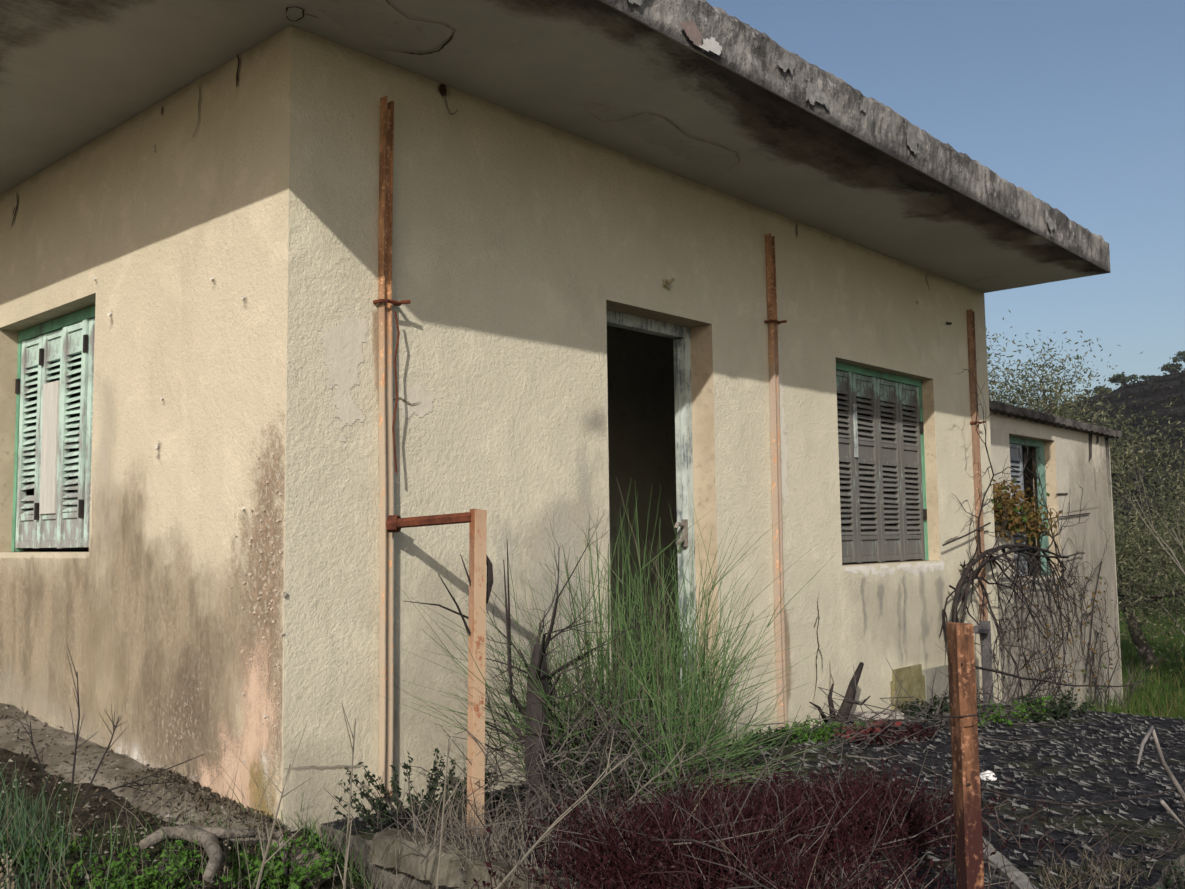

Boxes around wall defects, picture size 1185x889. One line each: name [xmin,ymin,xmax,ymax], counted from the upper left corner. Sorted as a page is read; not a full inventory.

spalling [778,50,830,110]
damp [522,0,1109,274]
damp [0,500,254,780]